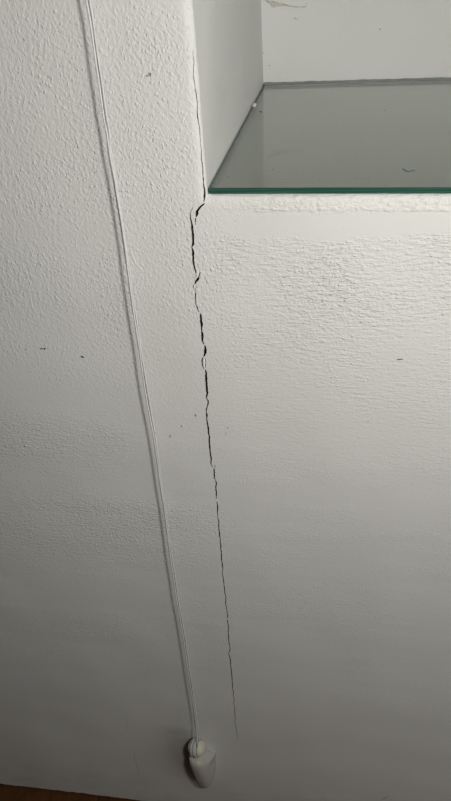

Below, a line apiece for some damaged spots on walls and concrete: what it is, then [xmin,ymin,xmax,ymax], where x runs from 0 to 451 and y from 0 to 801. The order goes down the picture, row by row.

crack [190,50,238,738]